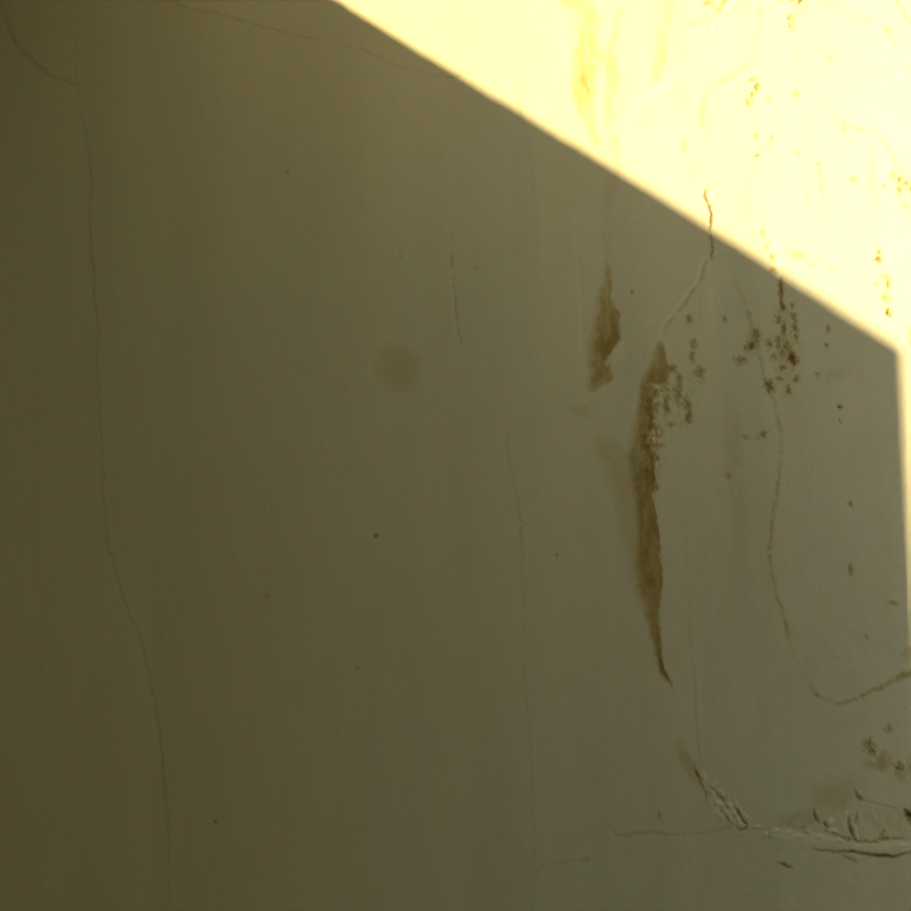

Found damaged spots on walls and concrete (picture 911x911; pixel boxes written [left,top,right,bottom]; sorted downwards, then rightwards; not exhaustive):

leakage [647,0,677,86]
leakage [547,0,624,422]
crack [656,181,721,345]
flaking render [729,73,814,420]
flaking render [870,228,897,322]
flaking render [881,153,911,232]
peeling [591,312,709,696]
crack [807,669,911,707]
flaking render [859,722,911,788]